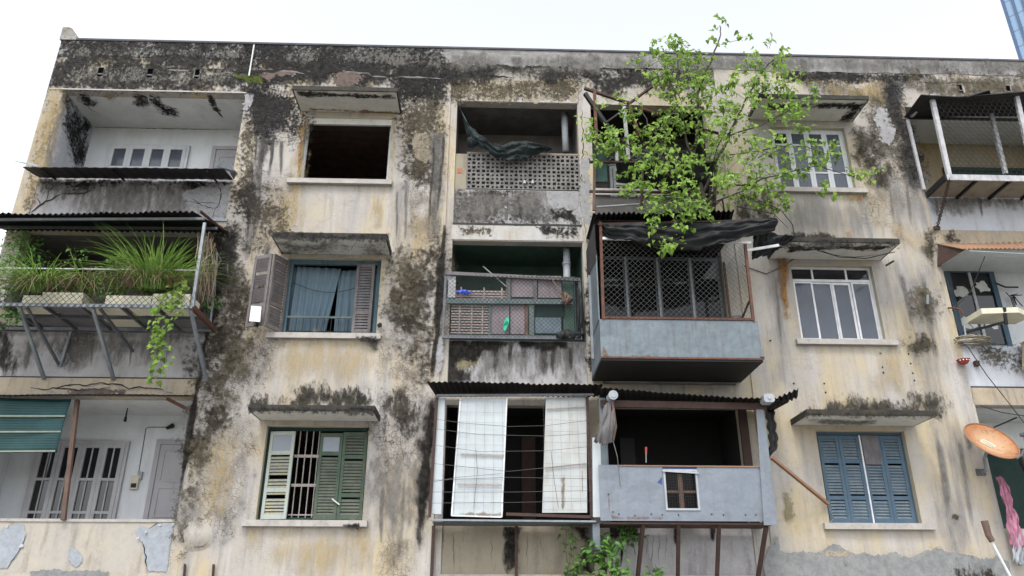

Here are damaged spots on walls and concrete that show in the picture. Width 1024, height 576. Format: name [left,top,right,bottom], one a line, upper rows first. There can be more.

crack [32,187,93,212]
water stain [39,40,953,553]
rust [778,258,788,317]
crack [30,382,172,394]
peeling [135,429,215,572]
water stain [959,439,972,508]
peeling [0,523,27,569]
water stain [610,528,638,563]